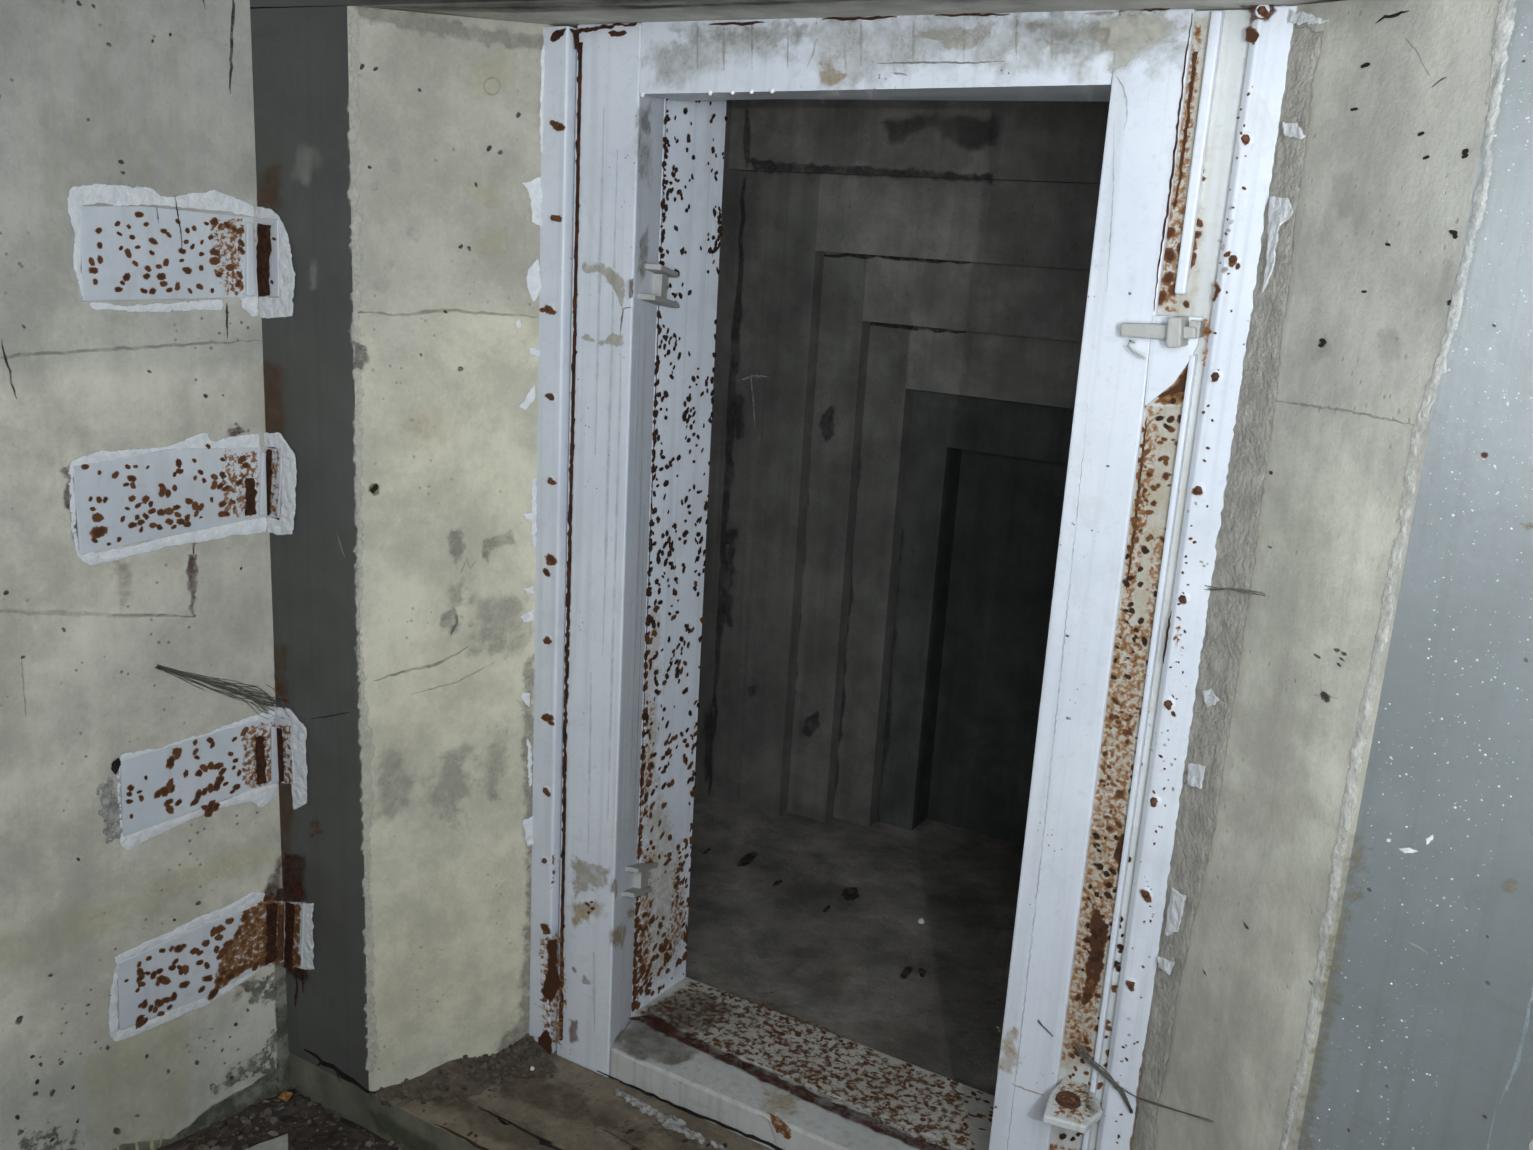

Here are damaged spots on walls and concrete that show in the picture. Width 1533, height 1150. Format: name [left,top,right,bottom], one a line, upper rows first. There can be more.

rust [89,211,276,297]
rust [1154,14,1206,312]
rust [1212,186,1246,312]
rust [1241,5,1275,45]
rust [81,444,280,546]
rust [124,722,307,1029]
rust [610,98,994,1150]
rust [1013,319,1219,1150]